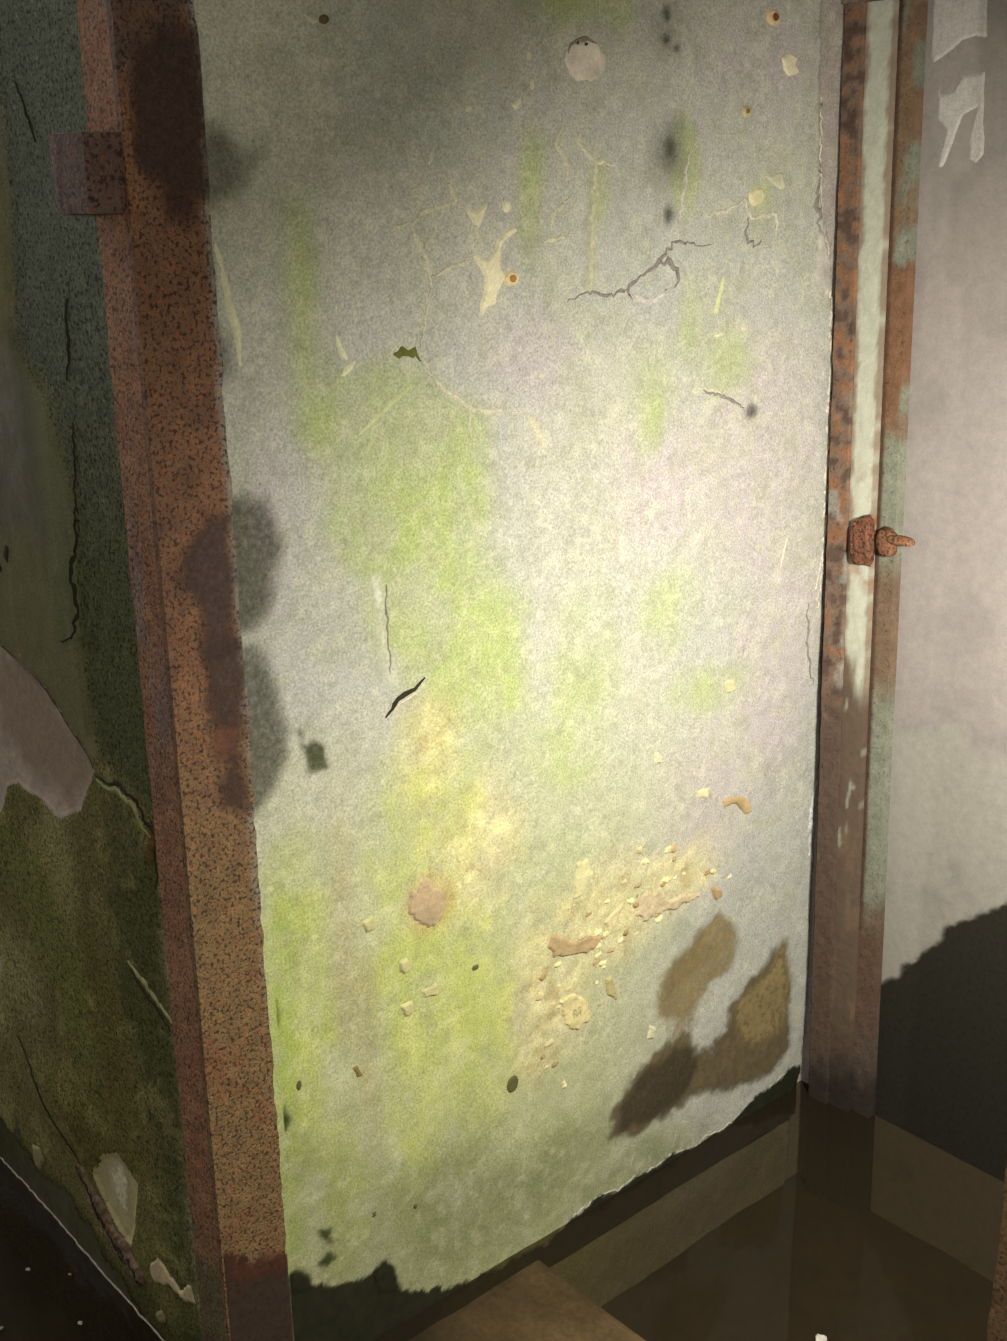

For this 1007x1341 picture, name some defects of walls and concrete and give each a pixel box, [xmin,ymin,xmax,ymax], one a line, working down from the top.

spalling [565,36,606,81]
crack [63,299,71,380]
crack [389,111,785,452]
crack [60,422,80,643]
spalling [0,644,95,819]
crack [372,576,428,720]
peeling [535,843,732,1030]
leakage [0,1117,161,1341]
spalling [92,1152,138,1247]
spalling [150,1258,196,1304]
leakage [224,916,800,1341]
spalling [507,1075,518,1093]